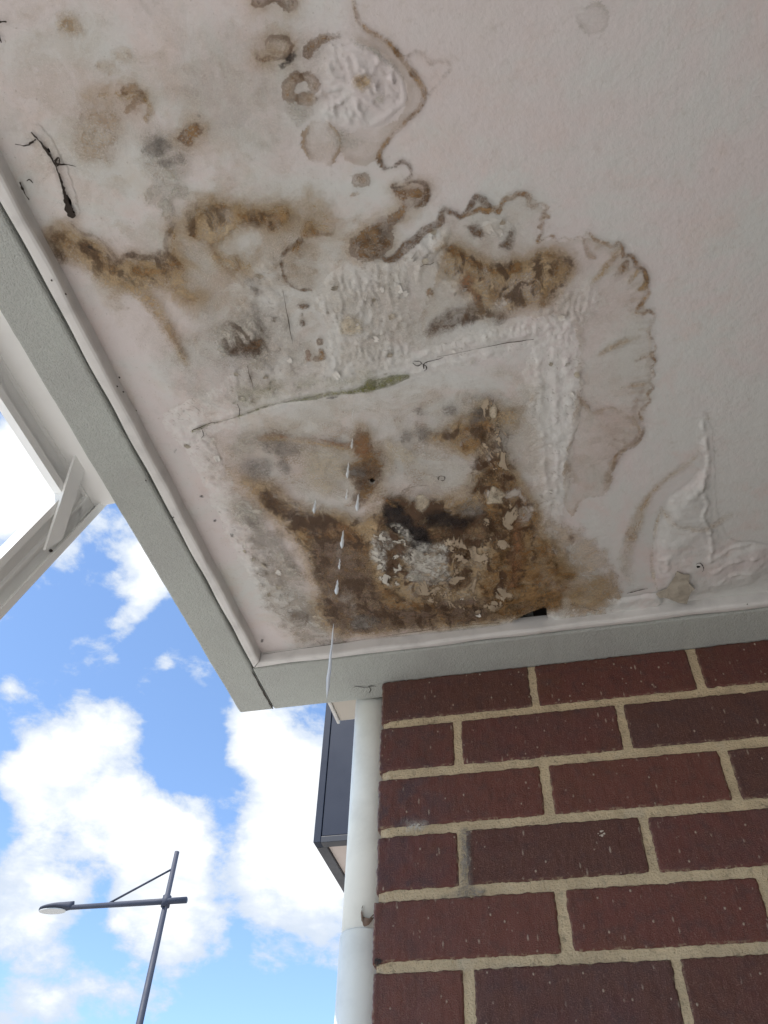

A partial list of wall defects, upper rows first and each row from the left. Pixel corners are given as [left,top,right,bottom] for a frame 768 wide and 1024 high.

leakage [354,8,402,57]
leakage [255,34,334,156]
crack [15,132,76,218]
leakage [51,122,291,360]
leakage [280,205,329,292]
leakage [349,138,528,263]
leakage [429,215,571,333]
leakage [591,235,653,314]
crack [192,365,273,437]
leakage [215,318,270,369]
leakage [232,398,622,643]
peeling [372,419,522,618]